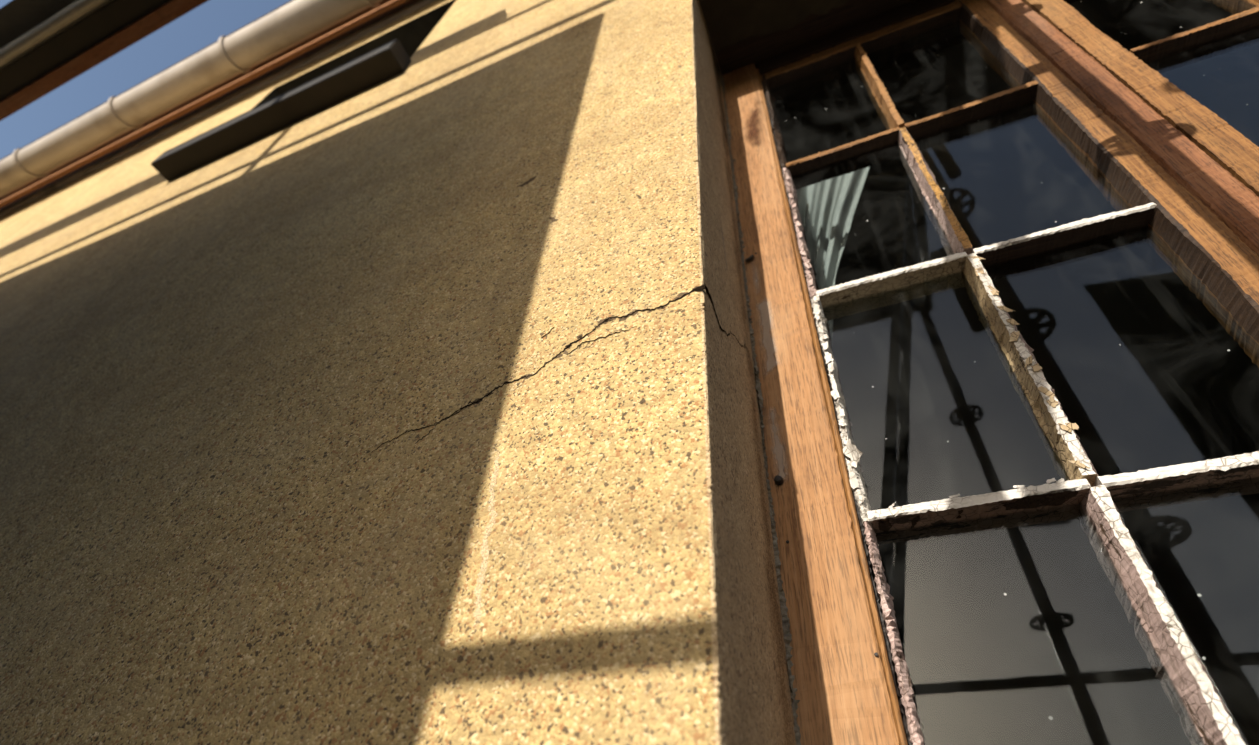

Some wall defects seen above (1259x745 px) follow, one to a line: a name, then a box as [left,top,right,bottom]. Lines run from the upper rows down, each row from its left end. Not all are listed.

crack [371,282,749,453]